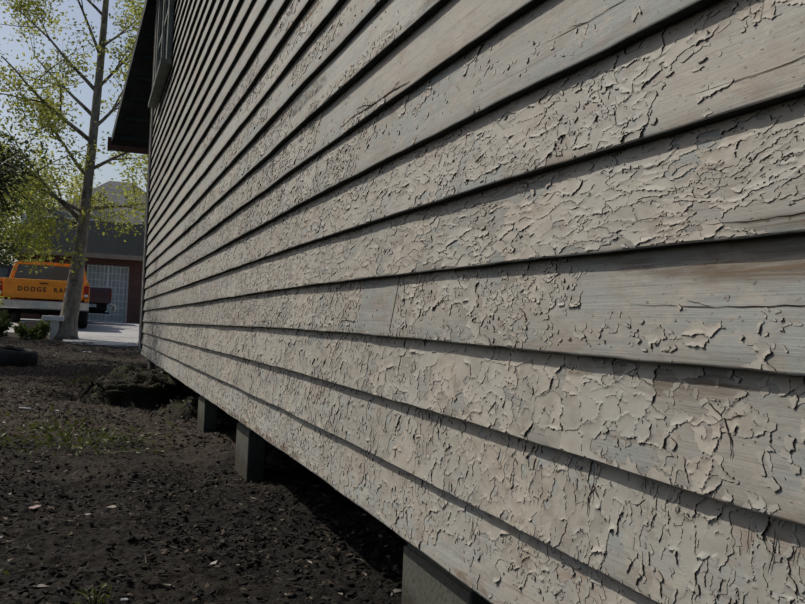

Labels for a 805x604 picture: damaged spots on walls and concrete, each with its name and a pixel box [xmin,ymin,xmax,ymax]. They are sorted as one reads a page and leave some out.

peeling [190,11,312,169]
peeling [274,0,300,37]
peeling [288,6,363,88]
peeling [305,10,403,118]
peeling [326,92,386,136]
peeling [695,77,734,104]
peeling [722,0,805,33]
peeling [182,95,324,251]
peeling [596,318,725,352]
peeling [727,307,805,409]
peeling [757,435,805,492]
peeling [626,538,647,585]